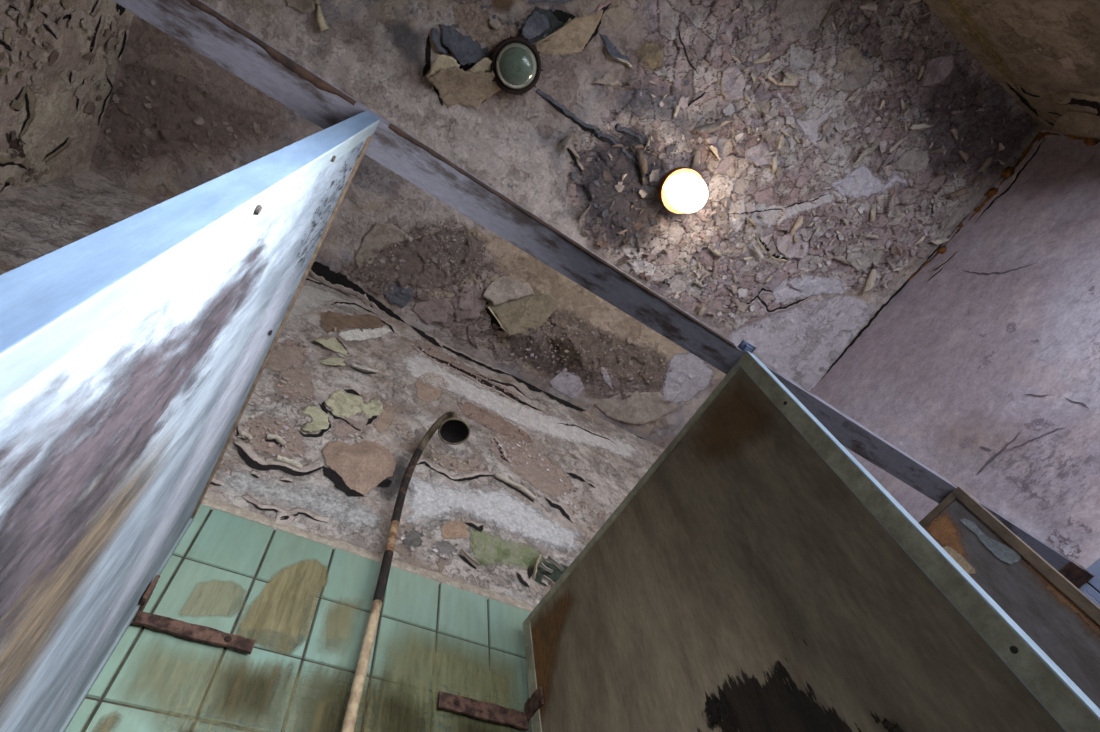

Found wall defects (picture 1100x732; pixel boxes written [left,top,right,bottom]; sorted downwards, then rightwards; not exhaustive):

peeling [0,0,123,124]
peeling [422,0,689,119]
crack [677,26,708,112]
crack [756,237,788,263]
spalling [283,284,392,374]
peeling [354,221,715,425]
crack [722,288,817,314]
flaking render [220,467,381,533]
peeling [237,389,384,469]
flaking render [400,339,639,586]
leakage [181,560,327,653]
leakage [141,637,515,732]